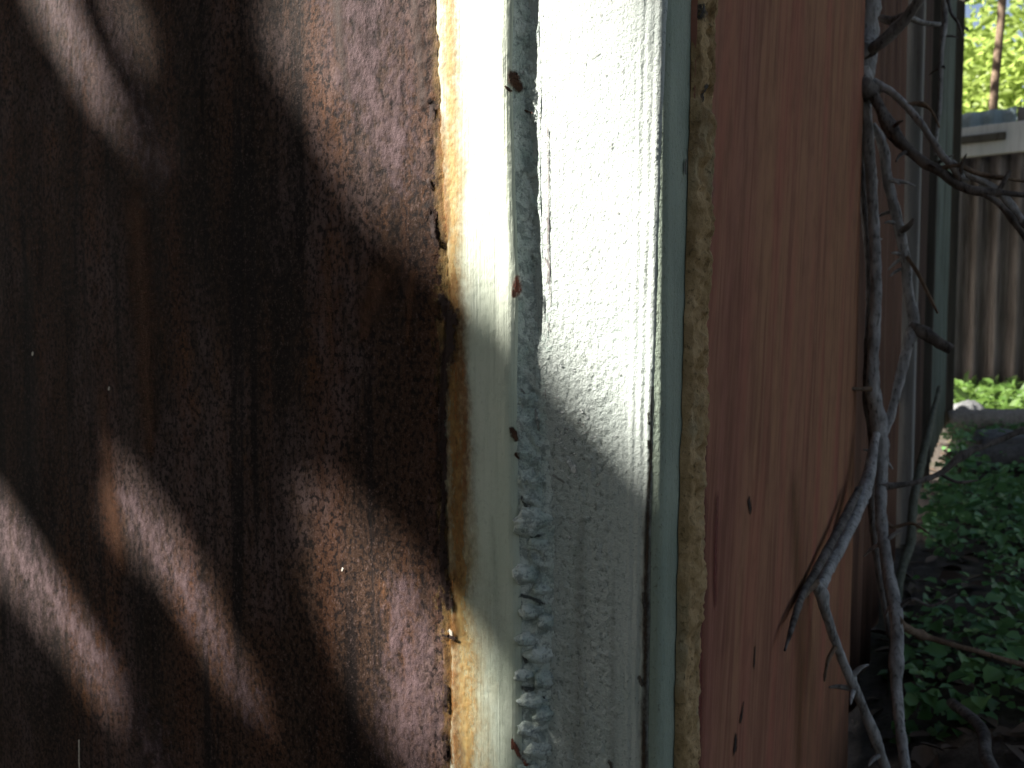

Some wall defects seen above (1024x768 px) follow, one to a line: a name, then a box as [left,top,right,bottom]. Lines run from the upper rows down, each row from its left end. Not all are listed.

corrosion [41,0,170,186]
corrosion [504,70,525,93]
corrosion [512,276,522,298]
corrosion [322,0,478,768]
corrosion [509,427,520,459]
corrosion [0,504,171,768]
corrosion [117,485,263,726]